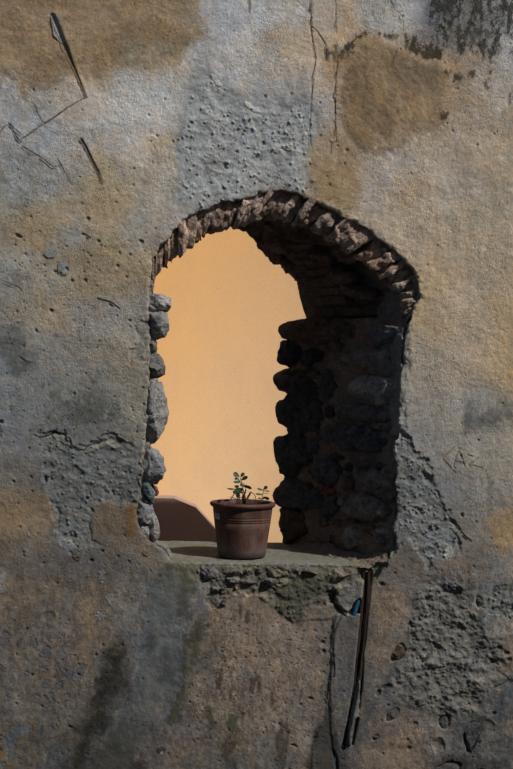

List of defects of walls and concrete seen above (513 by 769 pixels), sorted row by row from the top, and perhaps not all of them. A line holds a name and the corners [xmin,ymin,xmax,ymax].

crack [309,0,338,153]
water stain [379,0,513,89]
crack [0,124,57,167]
crack [34,429,111,451]
spalling [37,431,142,555]
crack [327,591,345,711]
spalling [386,574,513,752]
water stain [275,718,290,769]
peeling [359,734,460,769]